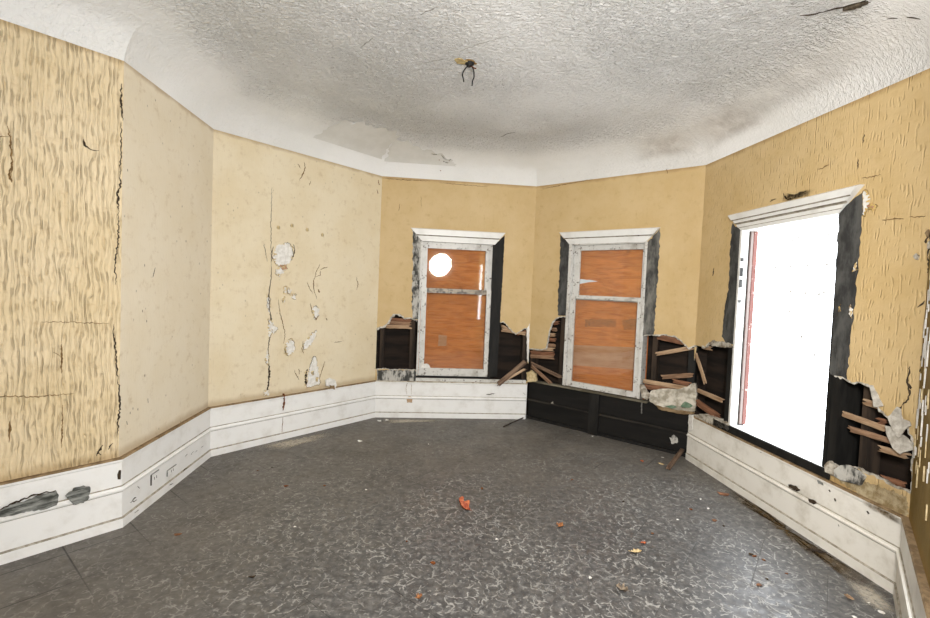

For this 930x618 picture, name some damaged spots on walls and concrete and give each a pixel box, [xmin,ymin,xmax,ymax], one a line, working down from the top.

crack [800,0,871,16]
peeling [265,242,297,338]
peeling [284,306,337,390]
flaking render [500,235,569,384]
flaking render [643,223,744,431]
flaking render [817,189,930,494]
spalling [0,485,91,517]